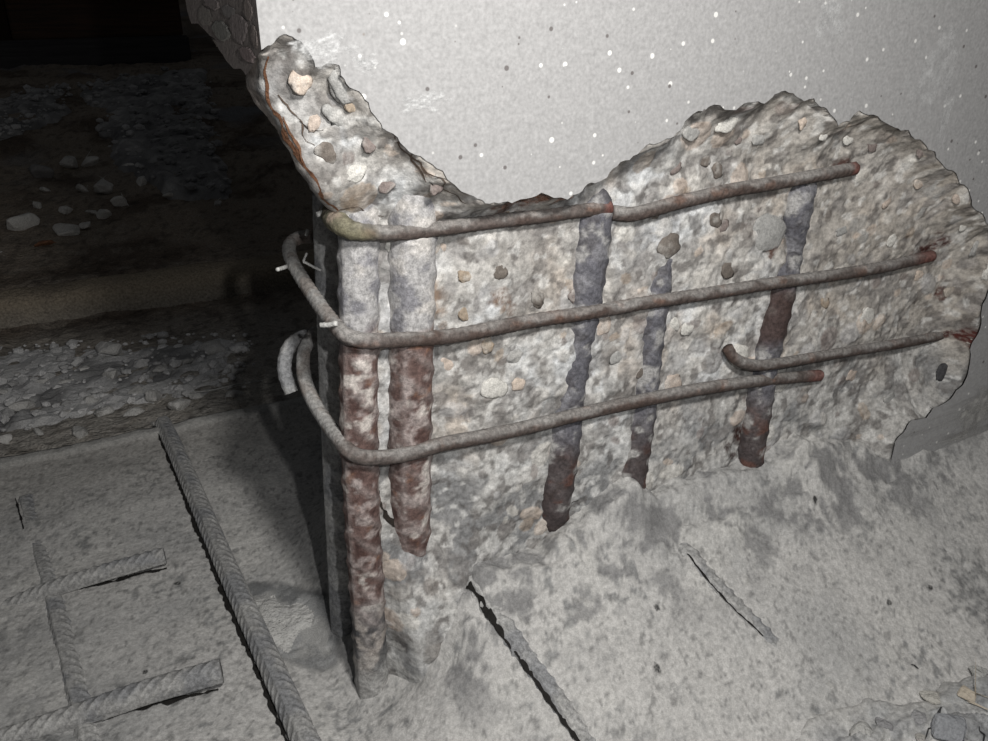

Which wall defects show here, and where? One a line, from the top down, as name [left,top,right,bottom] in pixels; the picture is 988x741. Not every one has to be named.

spalling [198,0,988,461]
spalling [569,409,635,516]
spalling [646,388,748,491]
crack [81,567,167,589]
crack [94,689,219,723]
crack [158,434,289,741]
spalling [247,582,339,670]
spalling [379,428,552,683]
crack [466,581,580,741]
crack [687,553,764,636]